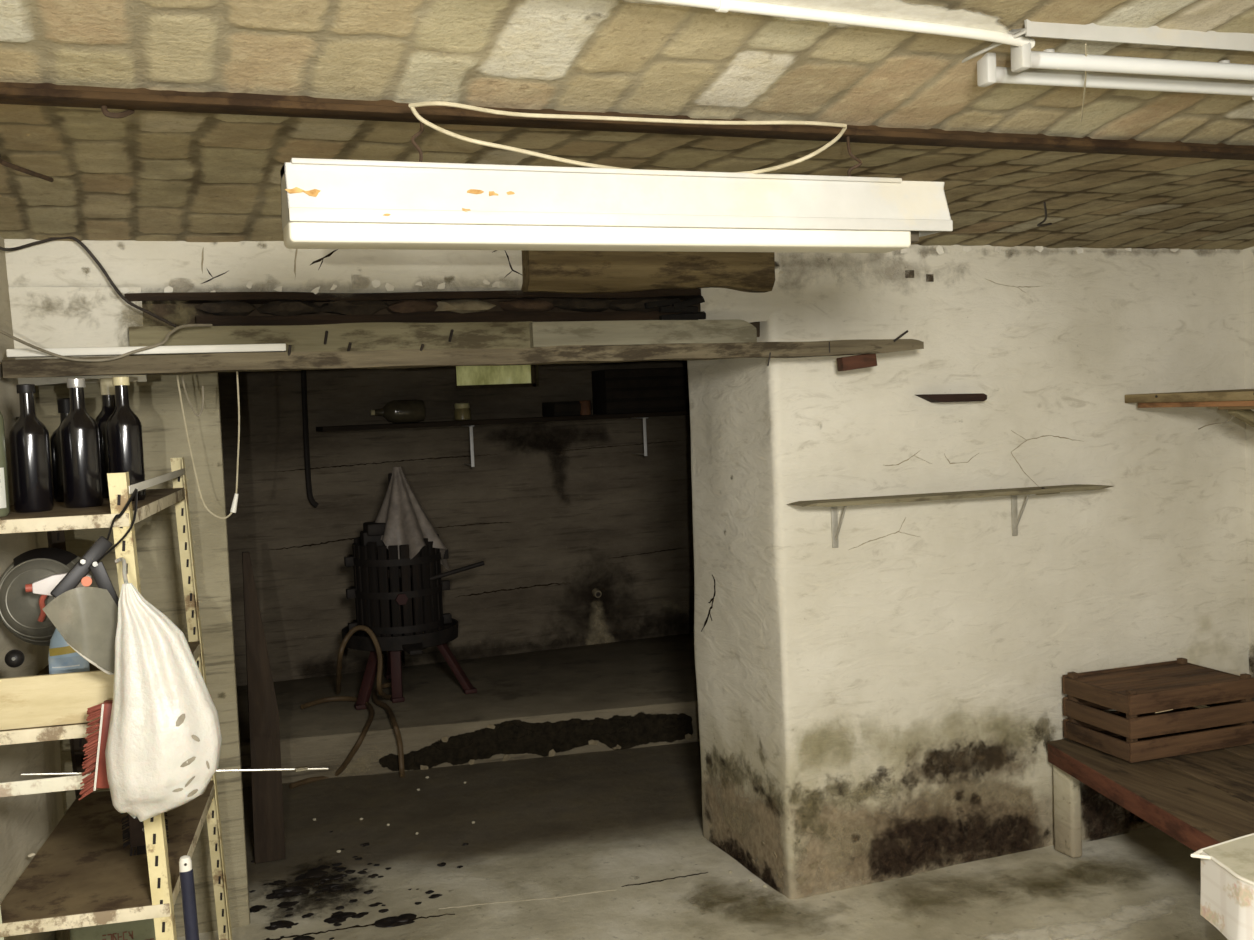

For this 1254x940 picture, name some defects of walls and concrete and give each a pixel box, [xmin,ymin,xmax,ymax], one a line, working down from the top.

crack [885,452,979,466]
crack [1011,430,1084,487]
damp [1034,719,1053,749]
damp [706,743,1049,880]
damp [710,838,783,891]